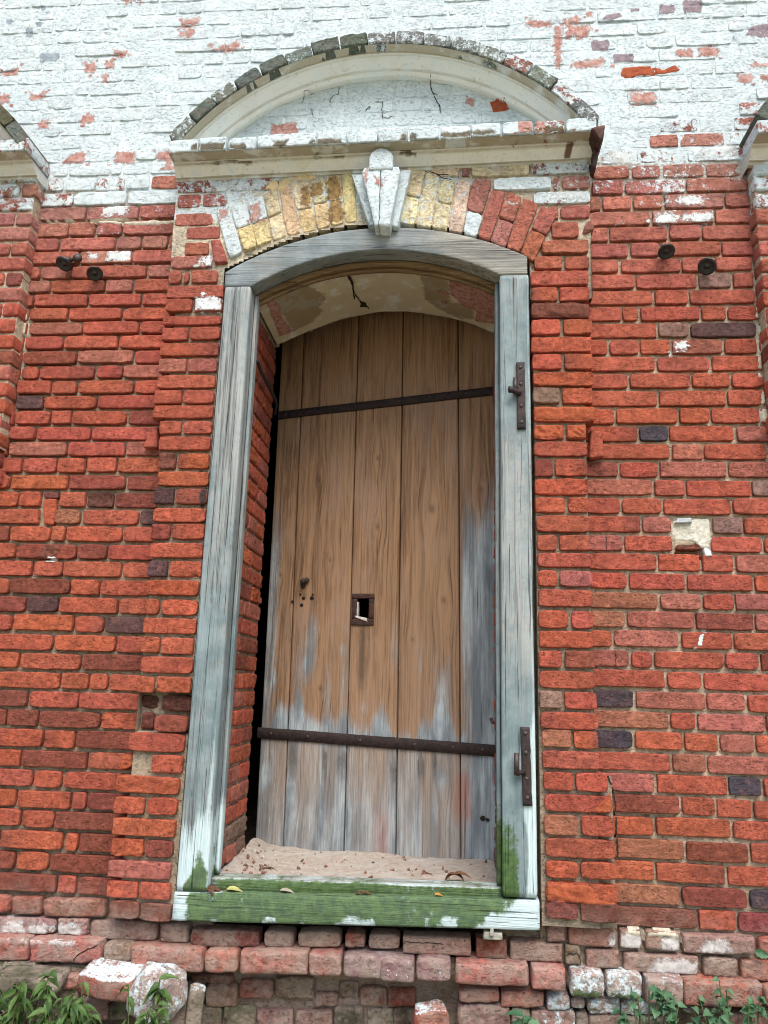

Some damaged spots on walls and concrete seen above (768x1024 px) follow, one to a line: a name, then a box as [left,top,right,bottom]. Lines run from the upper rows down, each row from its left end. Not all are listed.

peeling [177,17,200,40]
peeling [40,52,59,62]
peeling [82,48,130,85]
peeling [525,8,721,108]
peeling [78,111,95,127]
peeling [62,150,90,166]
peeling [108,151,135,166]
peeling [153,149,174,171]
crack [347,276,369,309]